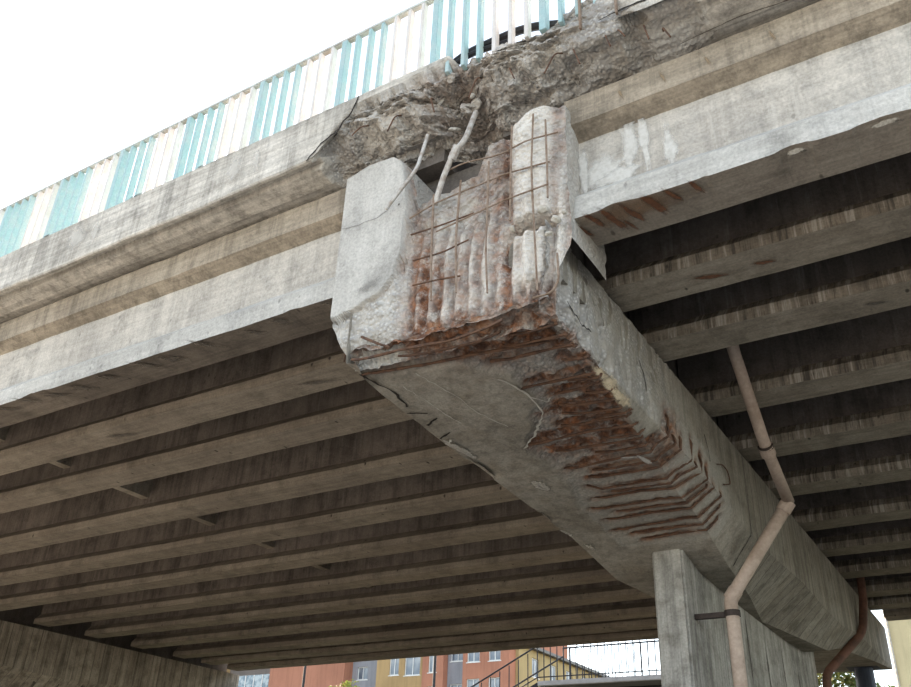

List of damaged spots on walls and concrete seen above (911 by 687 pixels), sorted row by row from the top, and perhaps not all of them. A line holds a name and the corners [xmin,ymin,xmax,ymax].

crack [599,0,645,21]
crack [680,0,788,44]
rust [579,190,683,236]
spalling [318,0,732,547]